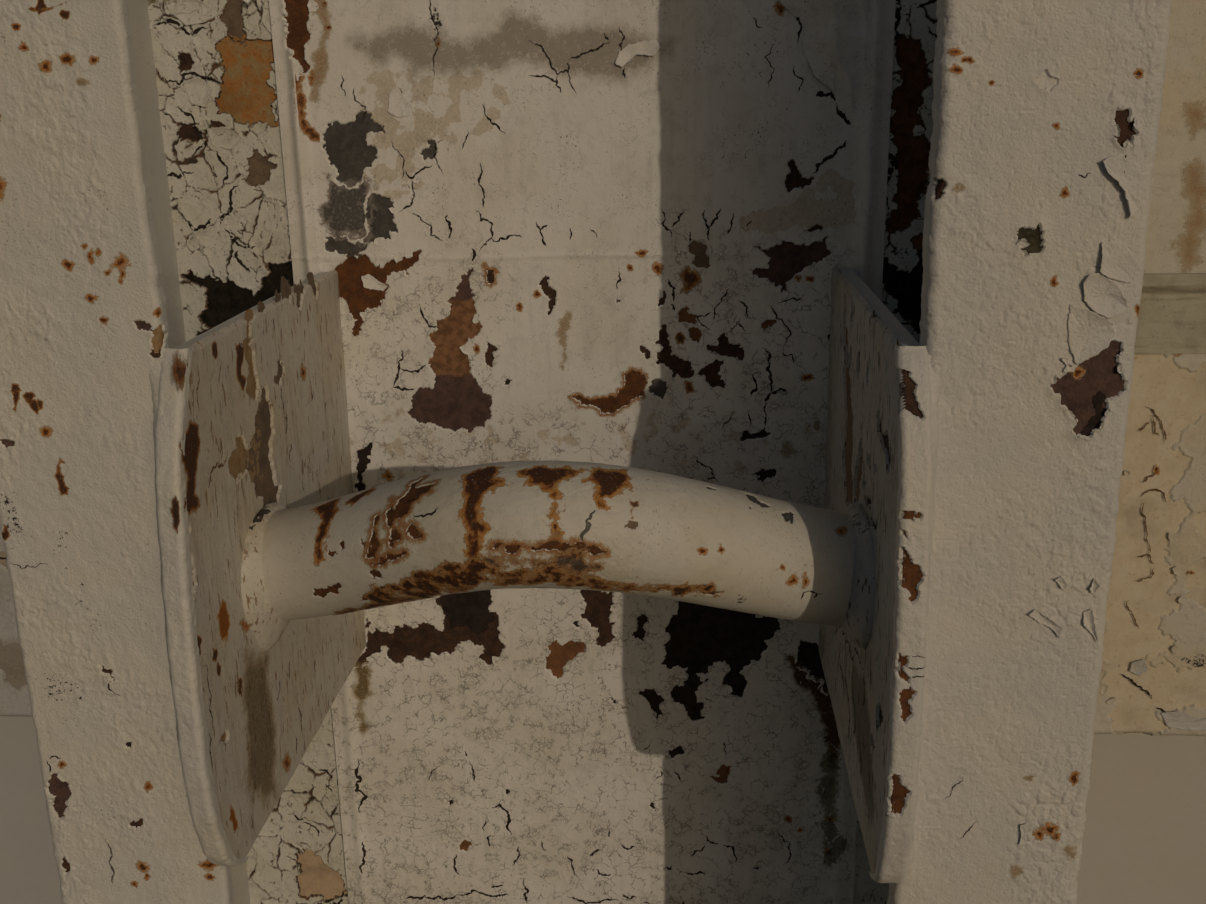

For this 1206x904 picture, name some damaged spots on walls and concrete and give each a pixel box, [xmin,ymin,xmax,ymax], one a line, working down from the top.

damp [356,7,648,76]
crack [147,0,292,342]
corrosion [61,243,131,284]
peeling [403,262,499,433]
corrosion [171,420,200,534]
corrosion [311,464,724,615]
peeling [1050,241,1206,733]
peeling [356,590,505,666]
peeling [632,584,781,721]
crack [246,662,368,904]
crack [407,803,650,904]
damp [815,745,847,866]